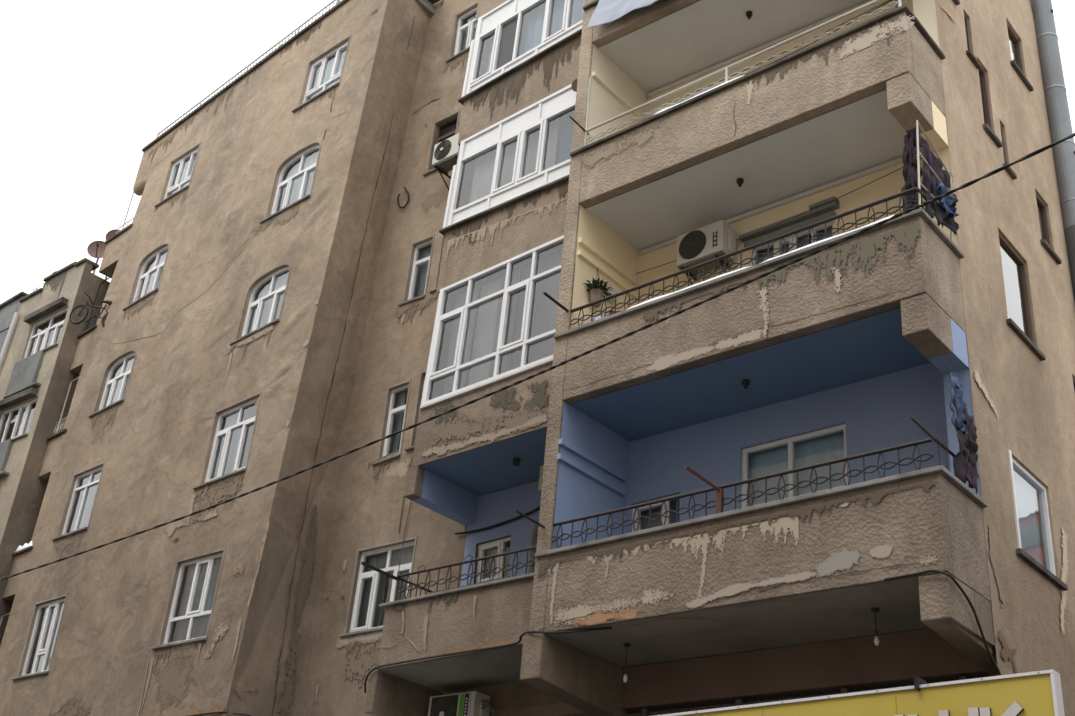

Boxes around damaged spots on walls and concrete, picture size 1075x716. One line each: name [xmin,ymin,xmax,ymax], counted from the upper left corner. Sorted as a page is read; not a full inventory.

damp [470,34,582,121]
spalling [383,413,548,479]